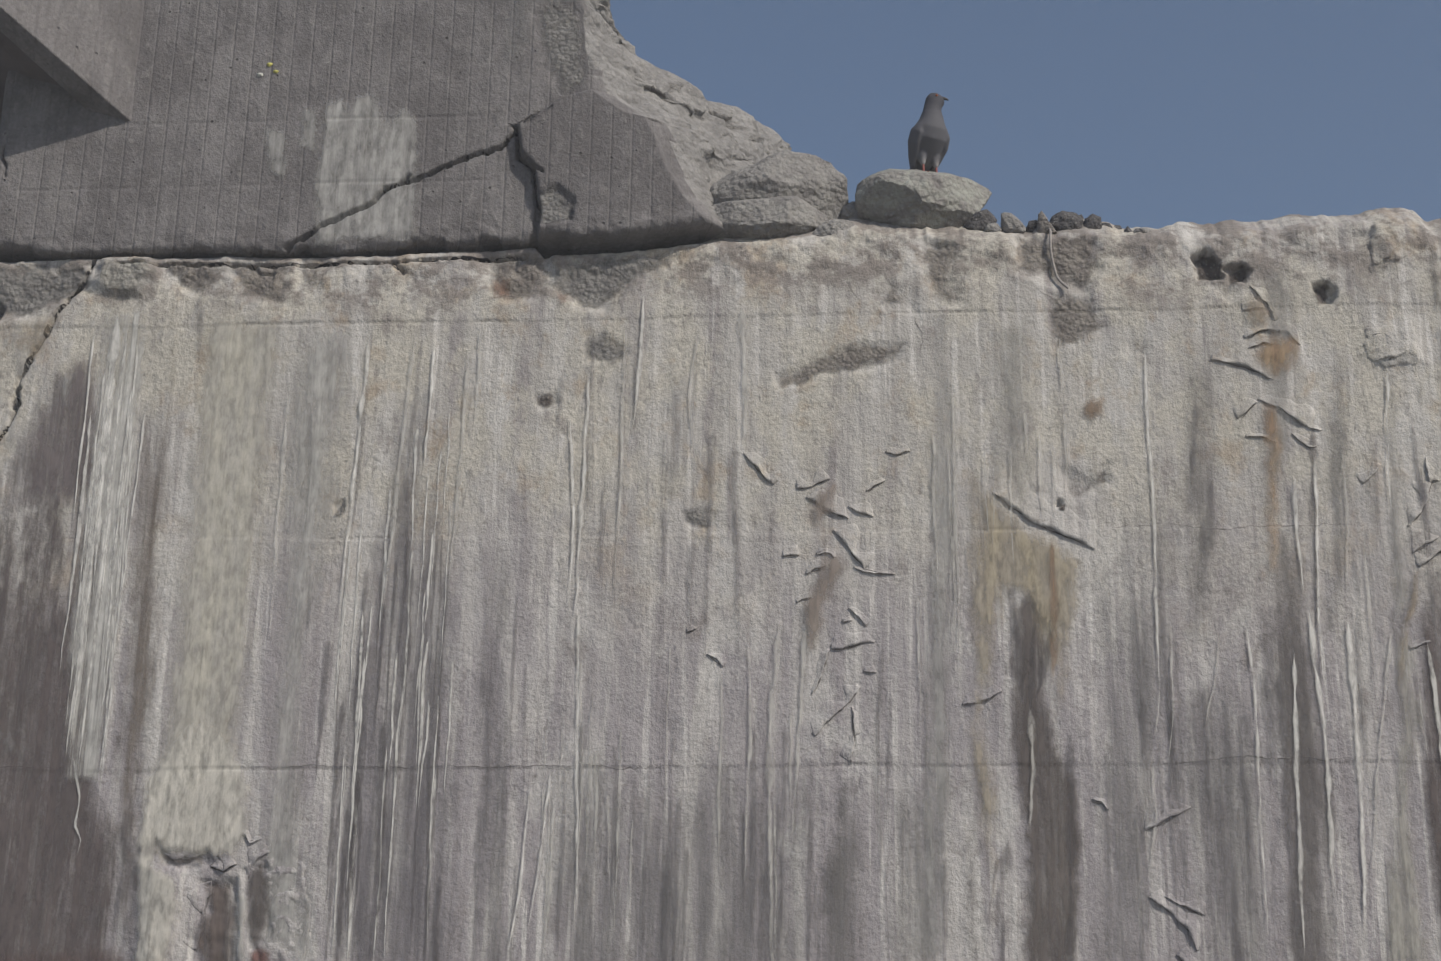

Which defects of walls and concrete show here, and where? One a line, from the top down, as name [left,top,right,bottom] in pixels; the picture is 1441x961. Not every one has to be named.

crack [0,261,94,441]
crack [207,246,522,274]
crack [383,132,598,214]
spalling [586,333,625,362]
spalling [781,345,899,385]
peeling [1195,257,1322,448]
spalling [1314,284,1327,304]
damp [0,312,346,961]
damp [328,332,482,961]
damp [1012,596,1080,961]